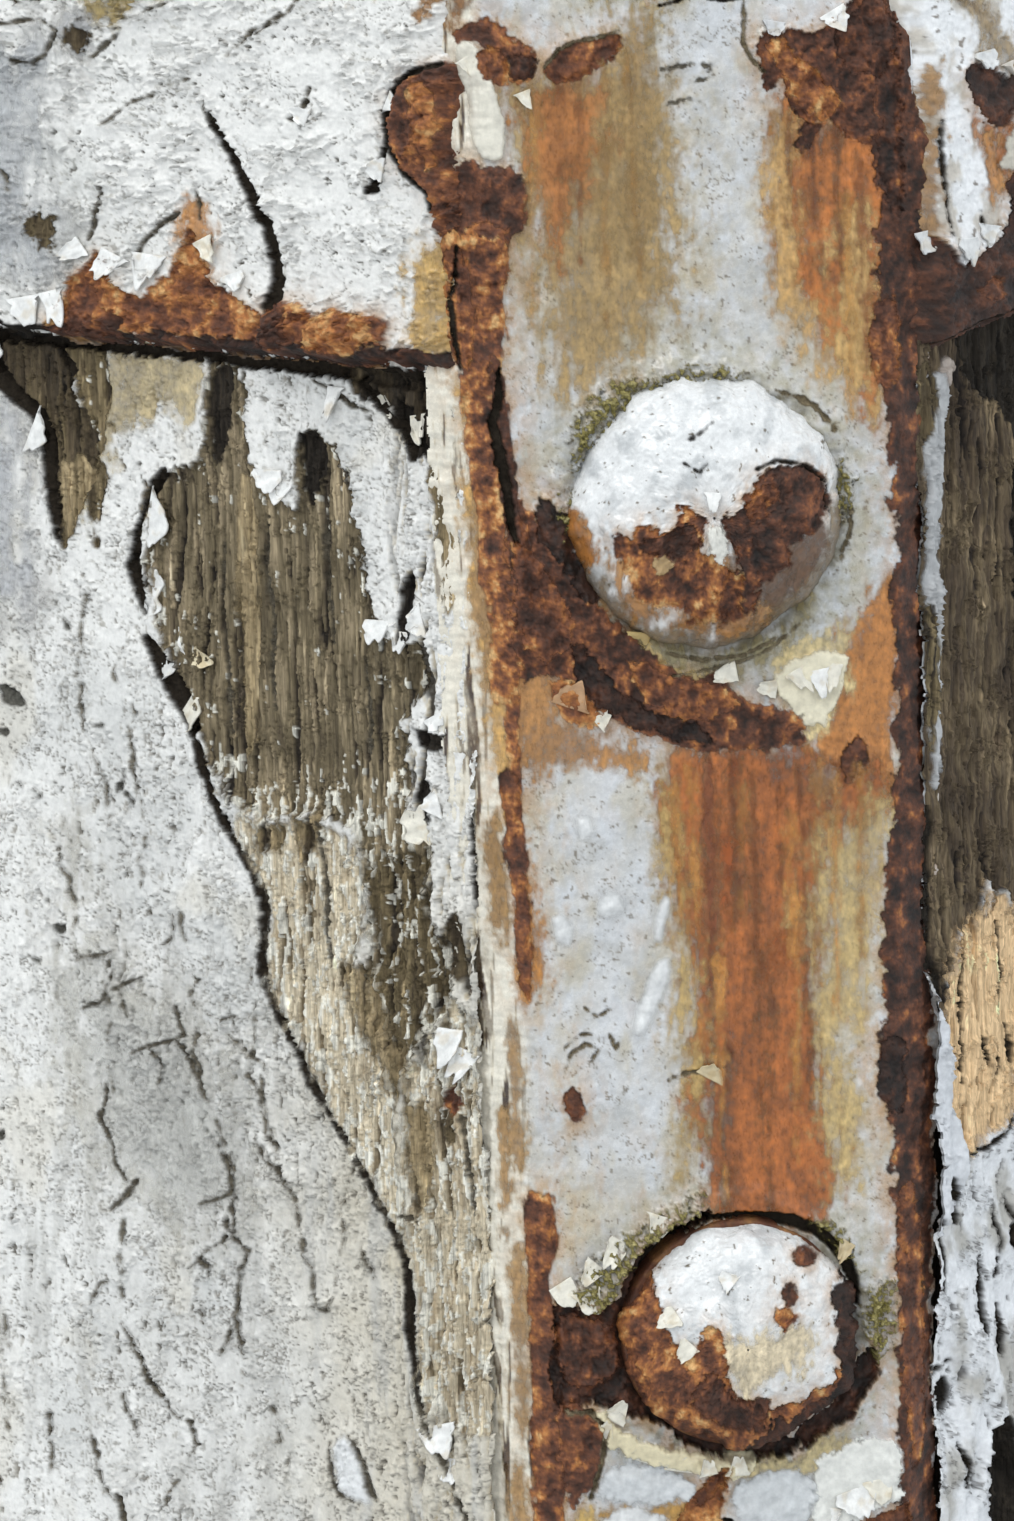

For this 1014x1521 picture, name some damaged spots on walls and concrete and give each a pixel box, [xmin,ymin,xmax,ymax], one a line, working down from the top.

crack [3,1316,11,1430]
crack [0,685,24,736]
peeling [23,211,57,253]
peeling [0,287,496,1485]
crack [32,467,468,1521]
corrosion [42,0,841,1005]
corrosion [496,1020,880,1521]
corrosion [654,0,1014,1521]
peeling [915,314,1014,1293]